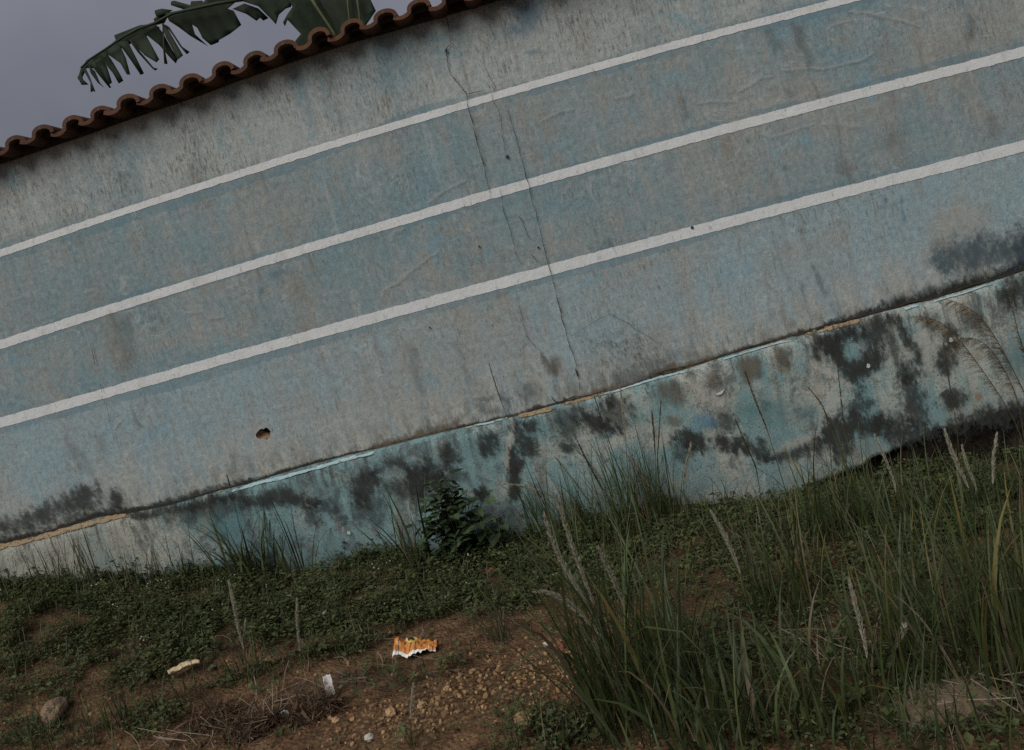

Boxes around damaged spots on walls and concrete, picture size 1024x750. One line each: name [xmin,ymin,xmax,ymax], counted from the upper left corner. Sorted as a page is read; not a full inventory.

crack [445,14,660,416]
damp [928,222,1024,311]
damp [668,309,1024,465]
damp [0,479,345,543]
spalling [256,428,270,439]
damp [349,442,466,509]
damp [473,485,489,501]
damp [476,416,537,504]
damp [553,392,635,453]